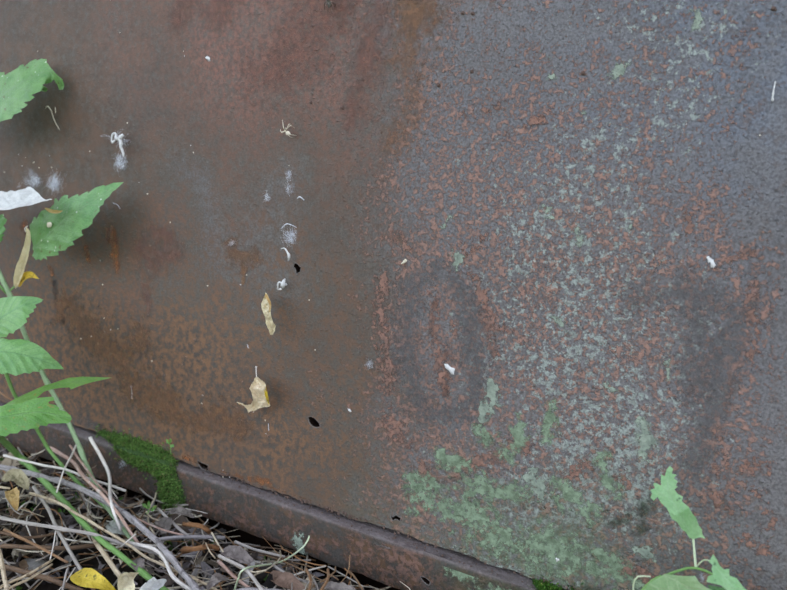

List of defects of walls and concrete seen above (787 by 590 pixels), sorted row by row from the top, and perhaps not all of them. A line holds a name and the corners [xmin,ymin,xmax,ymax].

rust [364,265,401,396]
water stain [471,400,561,465]
water stain [402,447,625,528]
water stain [444,567,478,584]